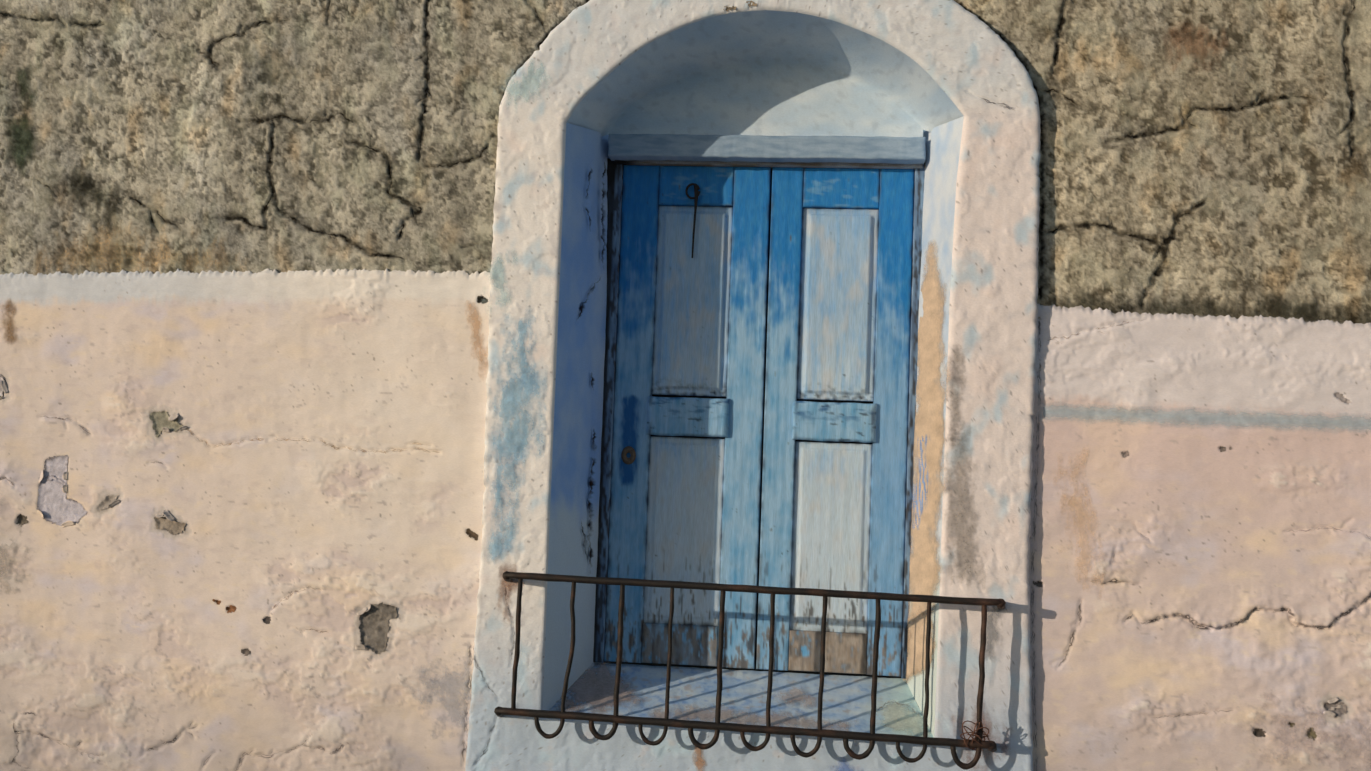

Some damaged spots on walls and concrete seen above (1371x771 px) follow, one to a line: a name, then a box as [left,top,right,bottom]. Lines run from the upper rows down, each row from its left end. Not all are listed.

crack [0,12,99,26]
crack [1344,0,1355,159]
leakage [8,67,35,175]
crack [224,0,487,259]
crack [1116,95,1306,140]
rust [5,301,15,342]
spalling [149,411,188,437]
peeling [16,455,121,527]
spalling [355,602,398,654]
crack [1127,594,1371,629]
spalling [1323,697,1347,718]
spalling [1288,722,1317,741]